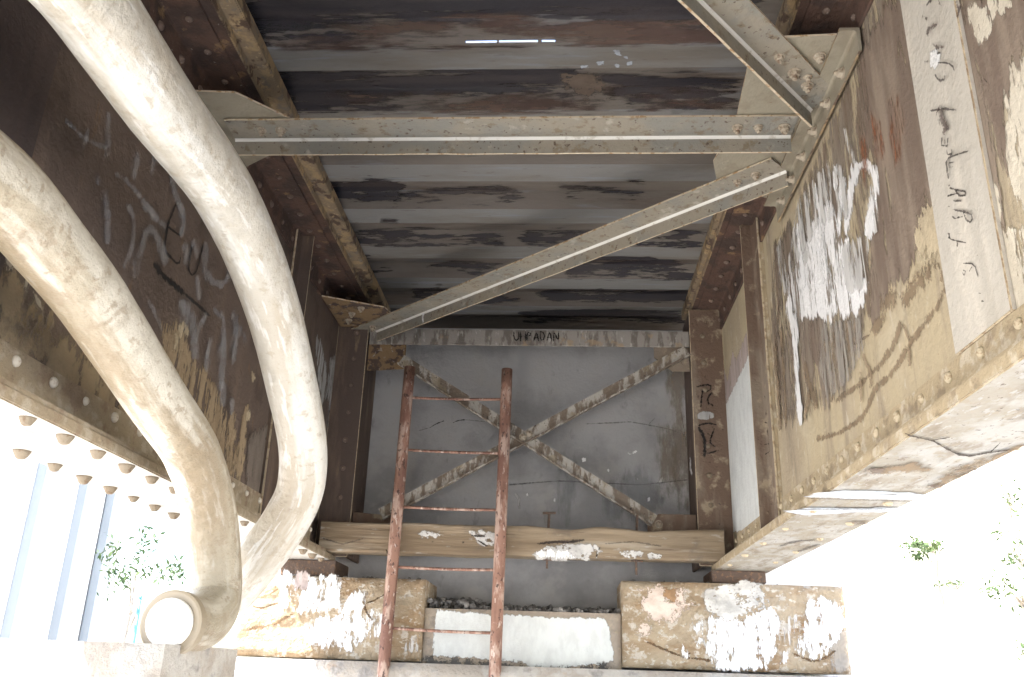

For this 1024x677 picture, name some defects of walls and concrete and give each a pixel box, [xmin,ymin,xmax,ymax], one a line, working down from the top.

peeling [581,50,632,69]
peeling [959,0,1024,309]
peeling [160,318,268,492]
crack [905,433,1009,457]
peeling [469,530,495,547]
peeling [532,543,603,561]
peeling [619,550,662,560]
peeling [279,569,382,652]
peeling [637,580,847,672]